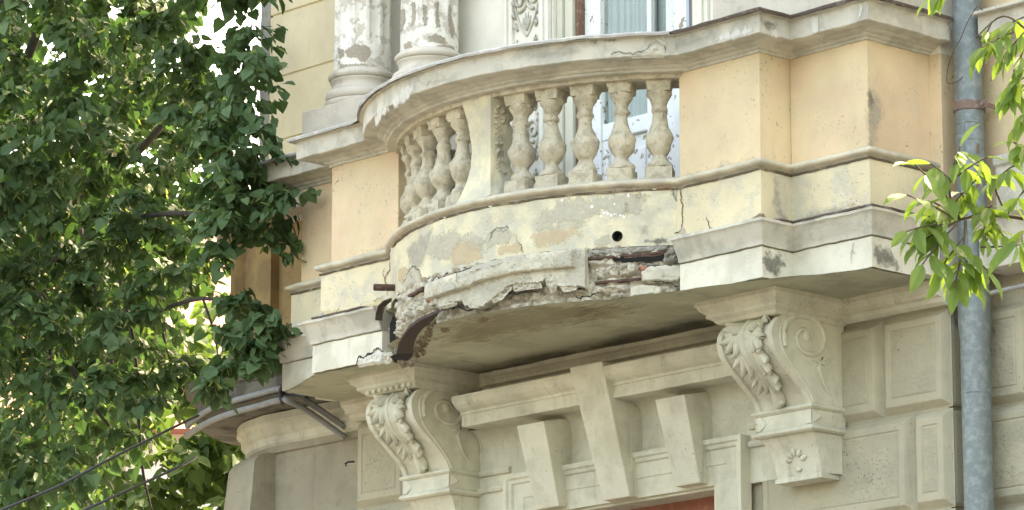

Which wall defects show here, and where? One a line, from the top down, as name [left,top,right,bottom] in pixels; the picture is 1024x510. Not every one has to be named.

peeling [400,2,455,50]
peeling [338,44,375,69]
water stain [866,92,879,129]
flaking render [533,192,646,246]
crack [673,190,710,233]
spalling [492,235,680,303]
water stain [763,251,786,275]
water stain [875,246,899,268]
spalling [358,226,521,370]